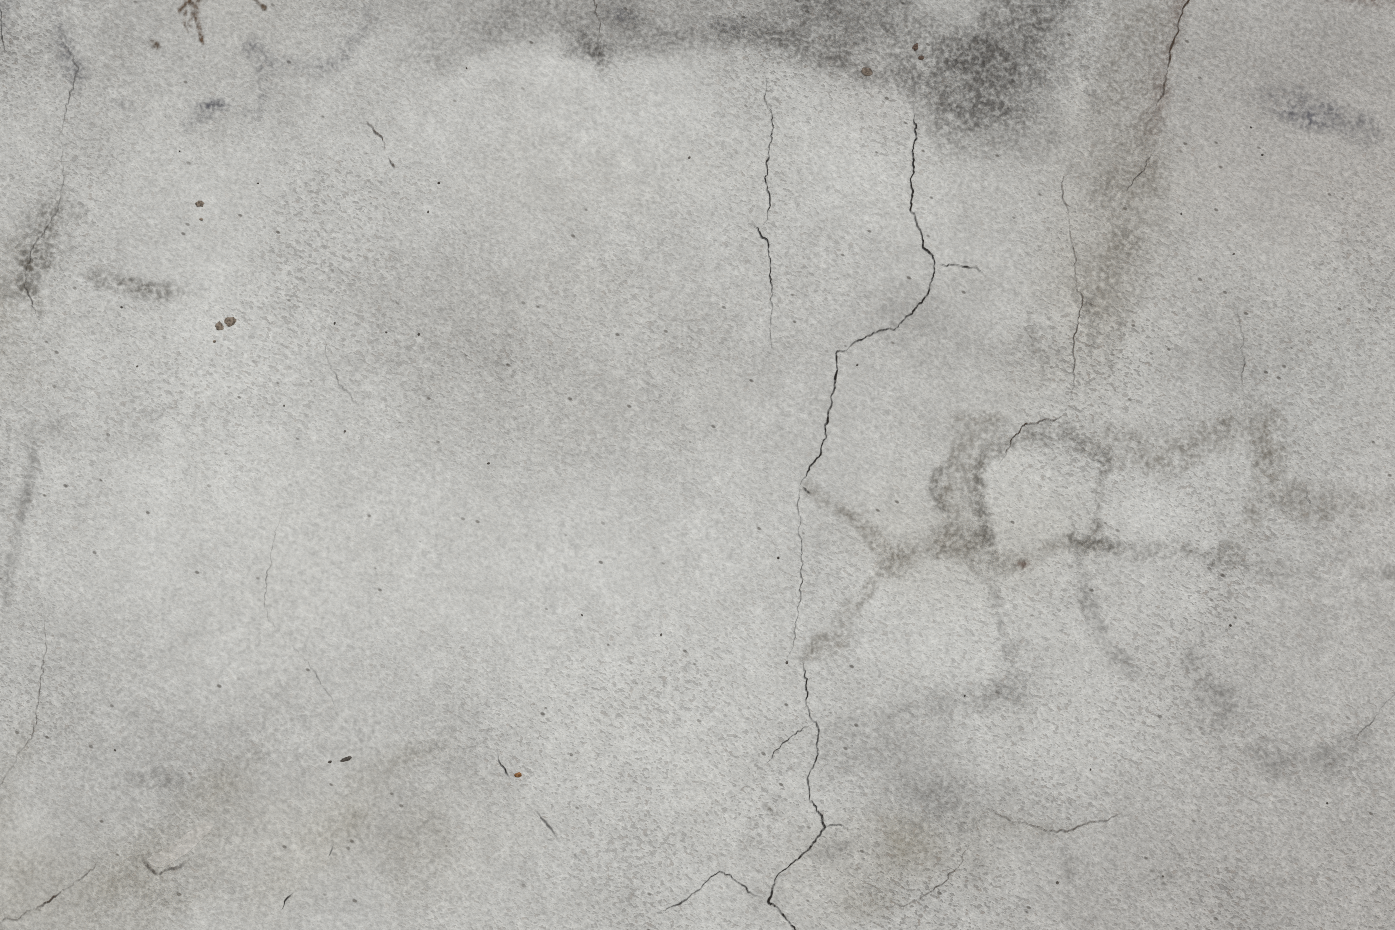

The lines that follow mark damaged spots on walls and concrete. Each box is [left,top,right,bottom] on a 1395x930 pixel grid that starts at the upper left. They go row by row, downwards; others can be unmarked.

damp [907,0,1042,125]
crack [756,94,774,304]
crack [803,119,978,493]
crack [666,670,842,930]